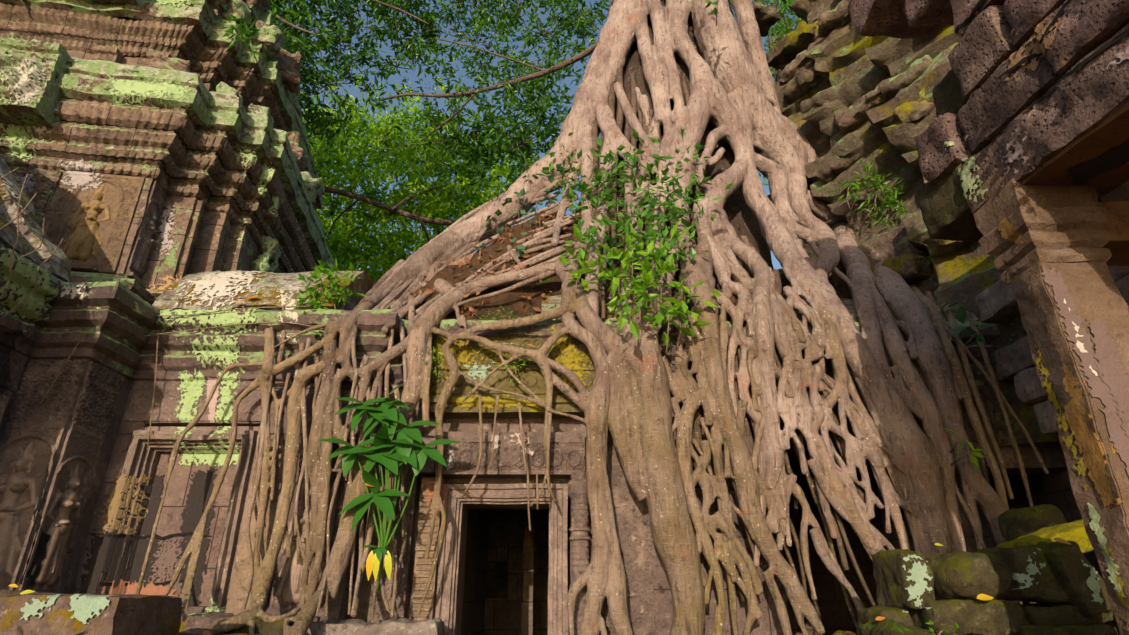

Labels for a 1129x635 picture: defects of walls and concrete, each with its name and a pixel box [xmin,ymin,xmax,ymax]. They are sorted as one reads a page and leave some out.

crack [996,0,1072,79]
crack [979,28,1129,151]